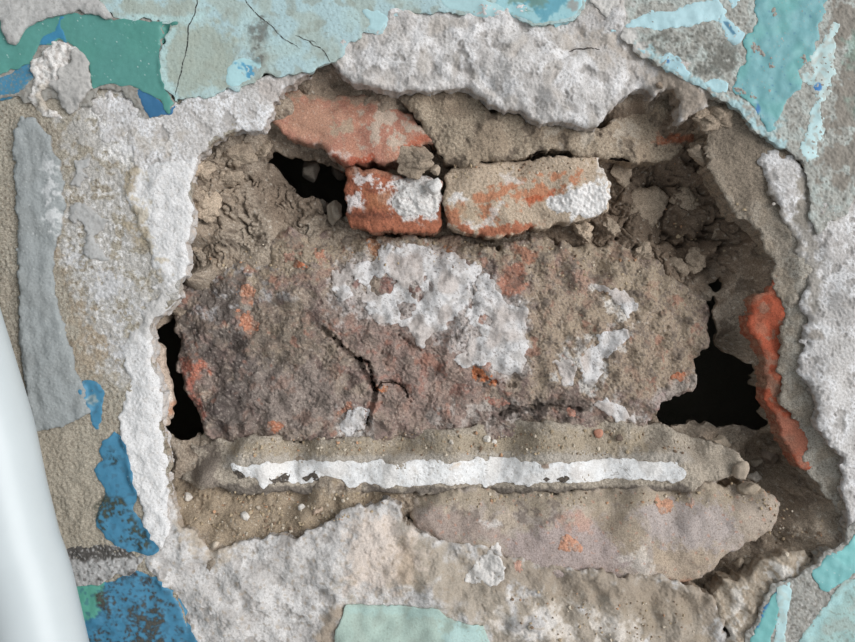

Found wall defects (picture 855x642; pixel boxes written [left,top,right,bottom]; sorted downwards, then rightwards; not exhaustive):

crack [175,0,198,94]
crack [245,0,330,61]
peeling [625,0,840,162]
spalling [0,0,774,387]
crack [332,337,409,398]
spalling [77,149,855,642]